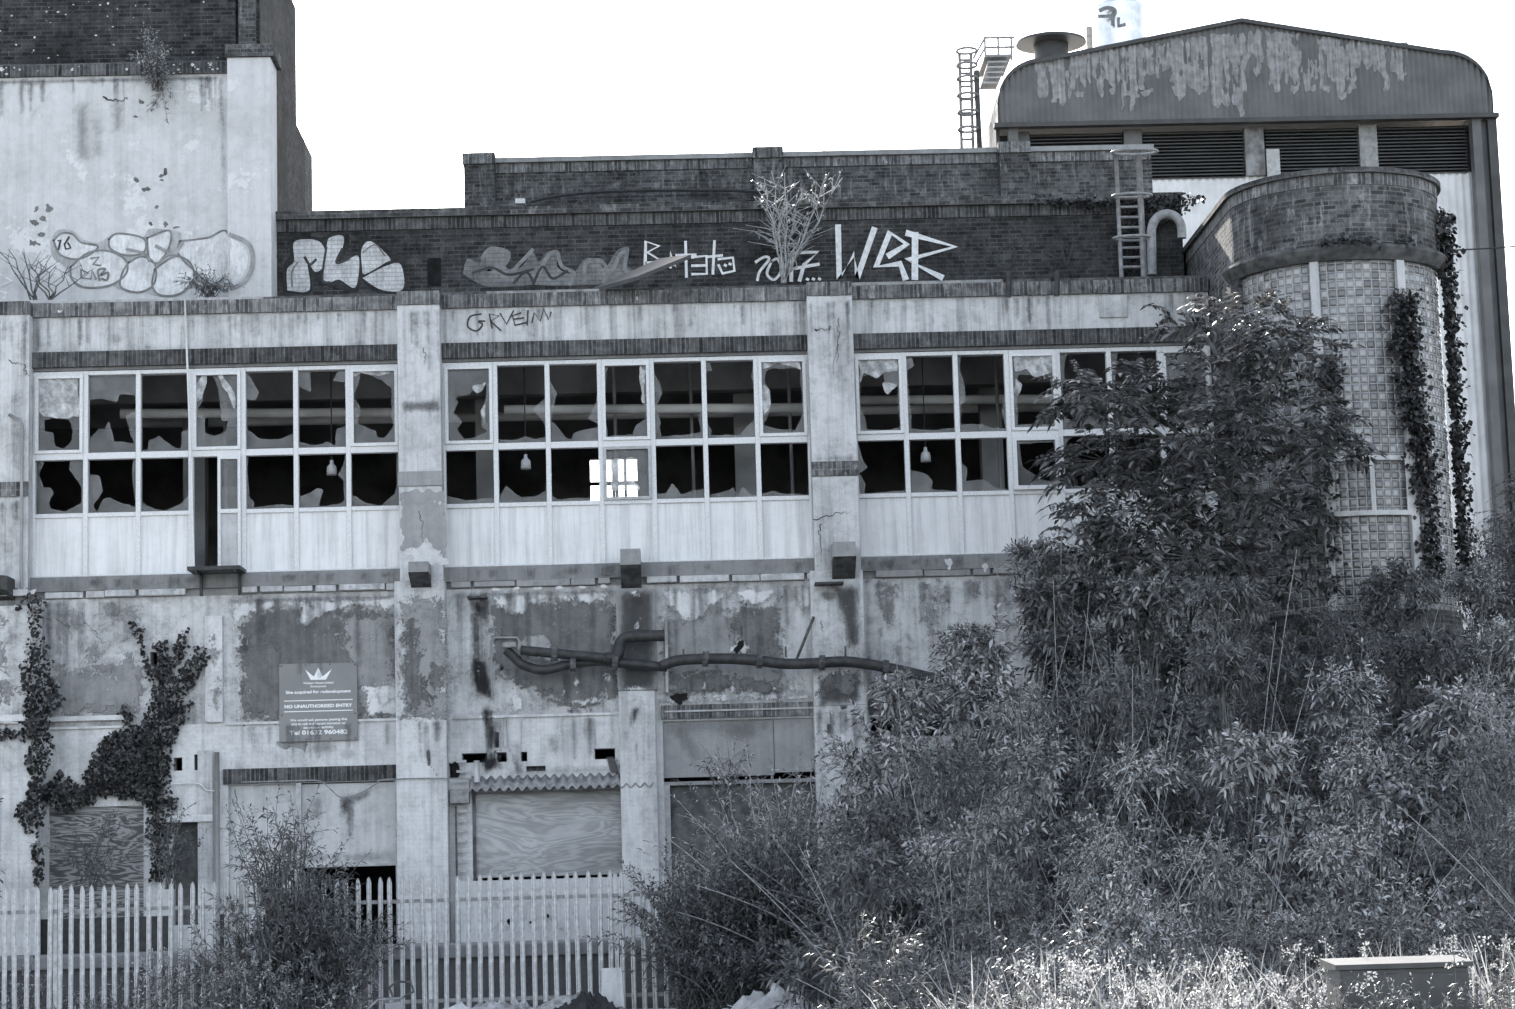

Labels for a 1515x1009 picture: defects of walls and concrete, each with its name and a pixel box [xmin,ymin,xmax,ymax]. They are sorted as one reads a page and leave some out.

peeling [1035,29,1408,117]
peeling [405,542,449,566]
peeling [491,584,610,639]
peeling [662,586,810,621]
peeling [423,662,448,697]
peeling [562,668,645,707]
peeling [666,672,837,705]